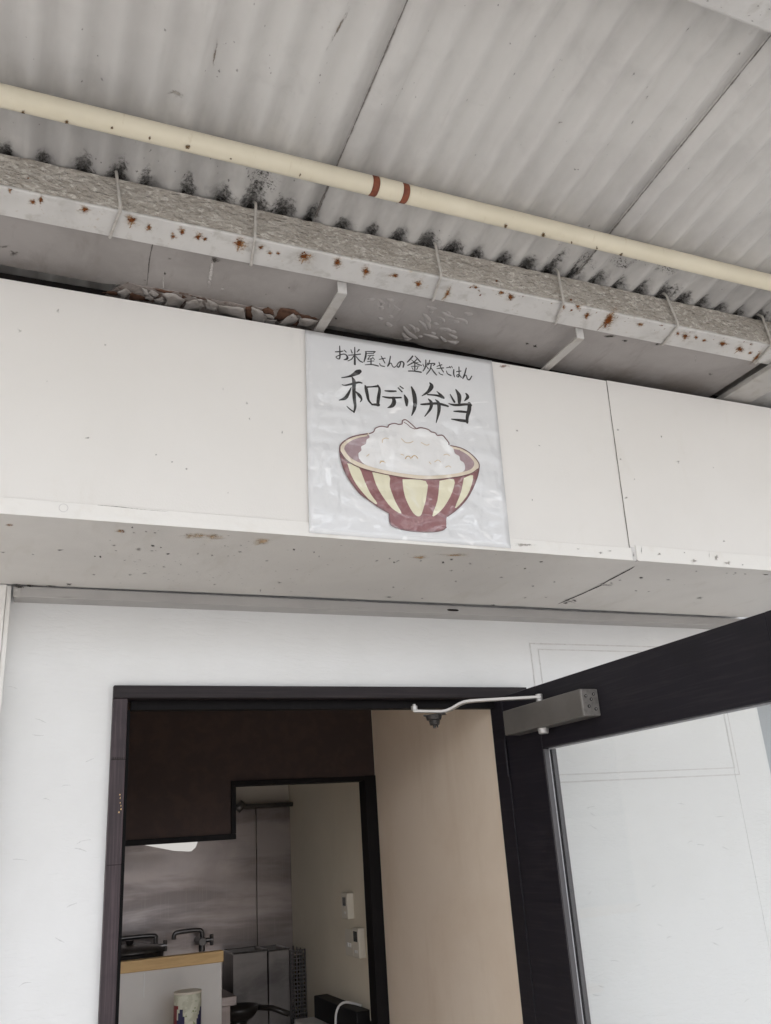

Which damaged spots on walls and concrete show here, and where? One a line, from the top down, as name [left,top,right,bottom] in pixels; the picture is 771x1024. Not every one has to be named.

damp [243,168,315,222]
rust [368,175,380,197]
rust [399,183,410,204]
peeling [0,153,771,344]
damp [415,230,480,258]
damp [520,241,602,283]
damp [655,286,704,306]
rust [551,299,614,328]